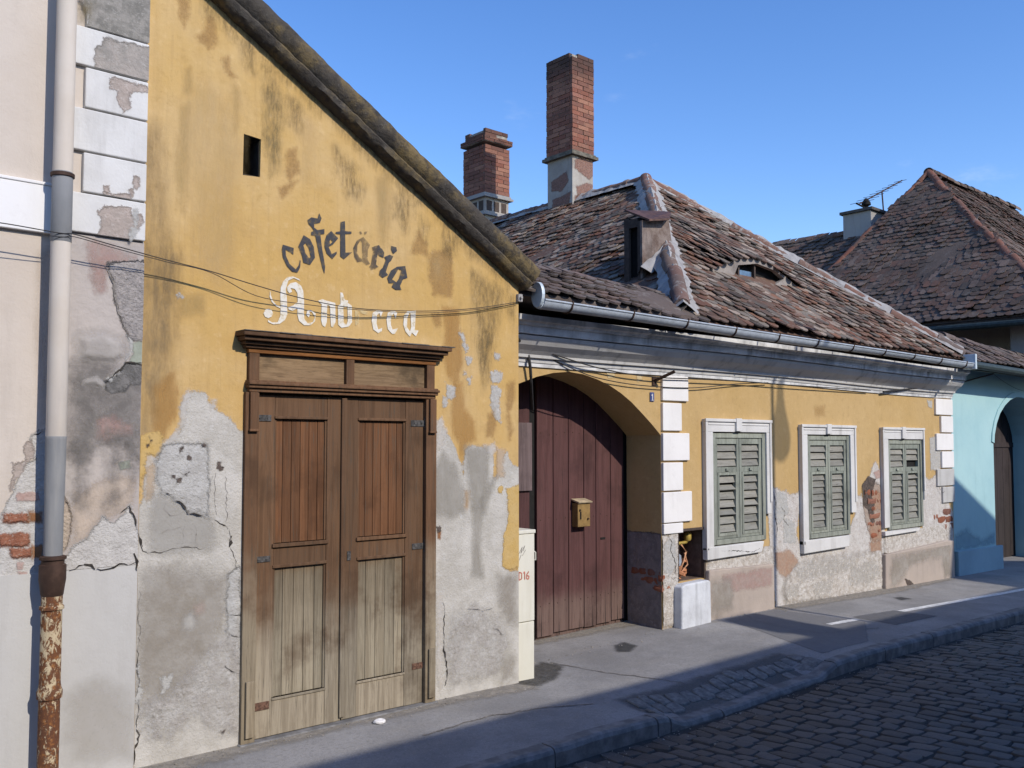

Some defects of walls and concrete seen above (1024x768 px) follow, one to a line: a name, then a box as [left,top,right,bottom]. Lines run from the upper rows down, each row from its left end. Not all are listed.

peeling [93,37,149,112]
peeling [97,175,144,241]
flaking render [104,260,144,393]
peeling [459,332,473,385]
peeling [490,352,503,422]
peeling [0,428,46,576]
crack [69,475,237,571]
peeling [63,390,243,768]
peeling [435,385,519,701]
flaking render [706,437,954,607]